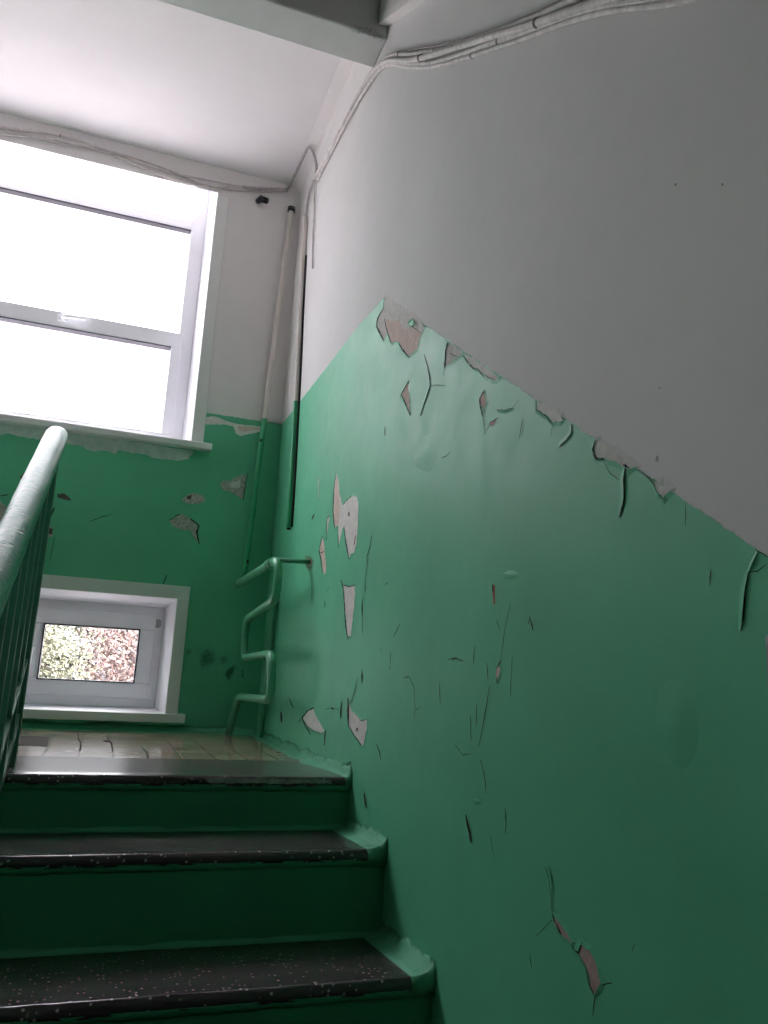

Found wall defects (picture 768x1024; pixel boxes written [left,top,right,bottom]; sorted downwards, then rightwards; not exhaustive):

peeling [376,294,426,358]
peeling [205,414,262,442]
peeling [400,380,412,416]
peeling [442,339,502,433]
peeling [589,435,677,505]
peeling [319,471,360,577]
peeling [341,581,357,639]
peeling [298,706,326,745]
peeling [347,678,369,749]
crack [448,603,533,789]
crack [464,811,507,857]
peeling [538,867,612,1015]